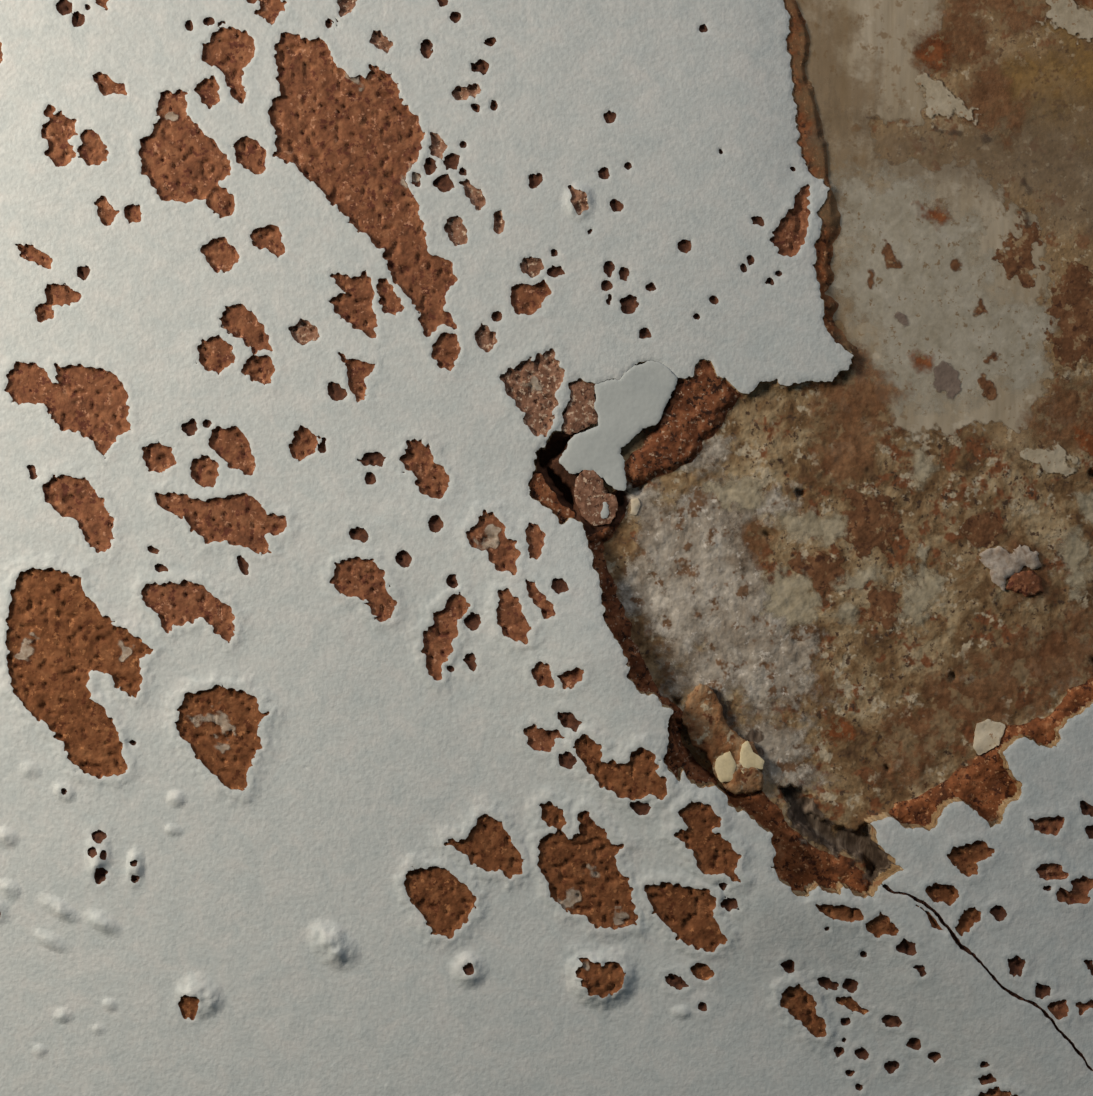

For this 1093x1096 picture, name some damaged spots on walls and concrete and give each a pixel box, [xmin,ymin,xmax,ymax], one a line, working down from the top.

corrosion [914,0,1051,146]
spalling [138,0,505,371]
spalling [474,249,565,353]
spalling [4,361,131,459]
peeling [142,441,176,473]
spalling [155,418,287,575]
spalling [499,0,1093,990]
spalling [5,567,153,779]
spalling [175,684,269,791]
spalling [404,866,477,939]
spalling [444,814,525,879]
crack [882,884,1093,1071]